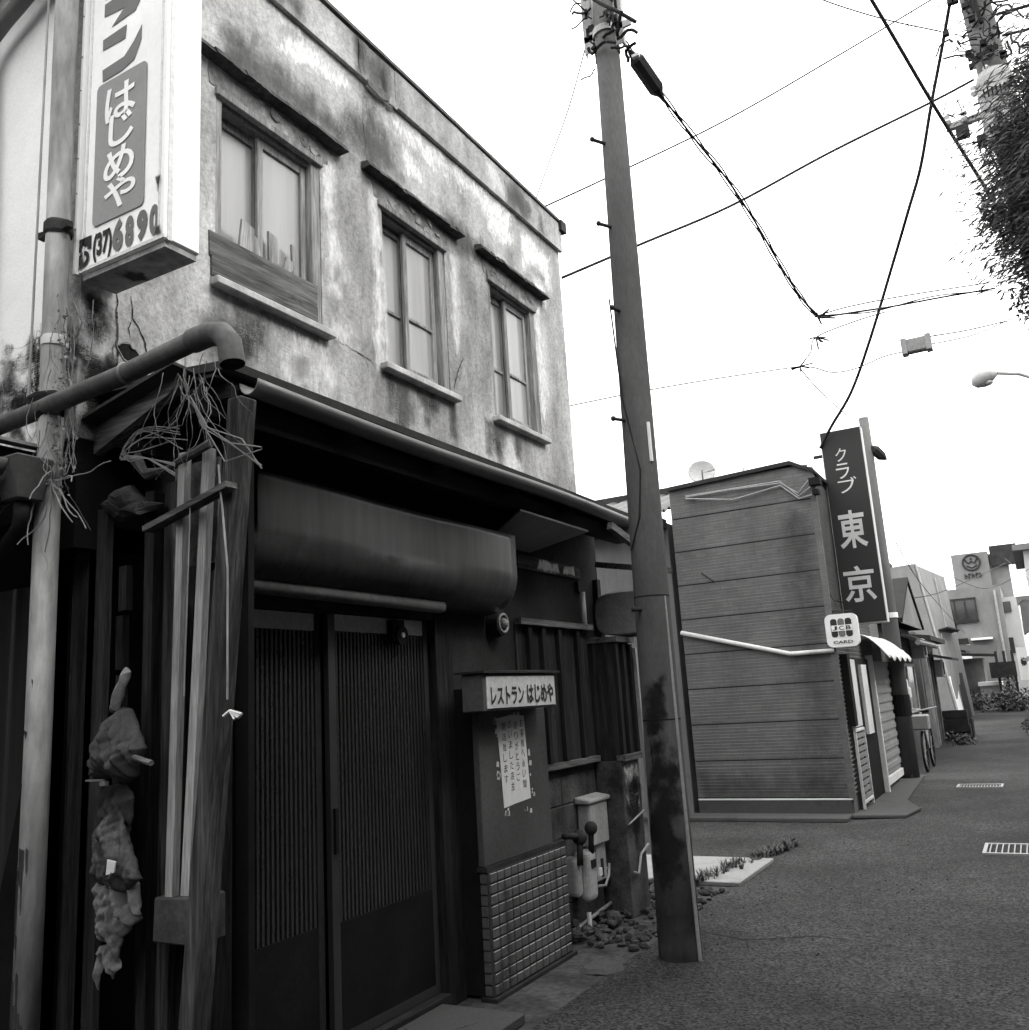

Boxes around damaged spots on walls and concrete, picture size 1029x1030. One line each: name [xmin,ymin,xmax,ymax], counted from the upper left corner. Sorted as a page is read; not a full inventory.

leakage [278,15,348,89]
leakage [0,332,41,415]
leakage [65,290,117,388]
leakage [227,318,336,395]
leakage [333,322,348,341]